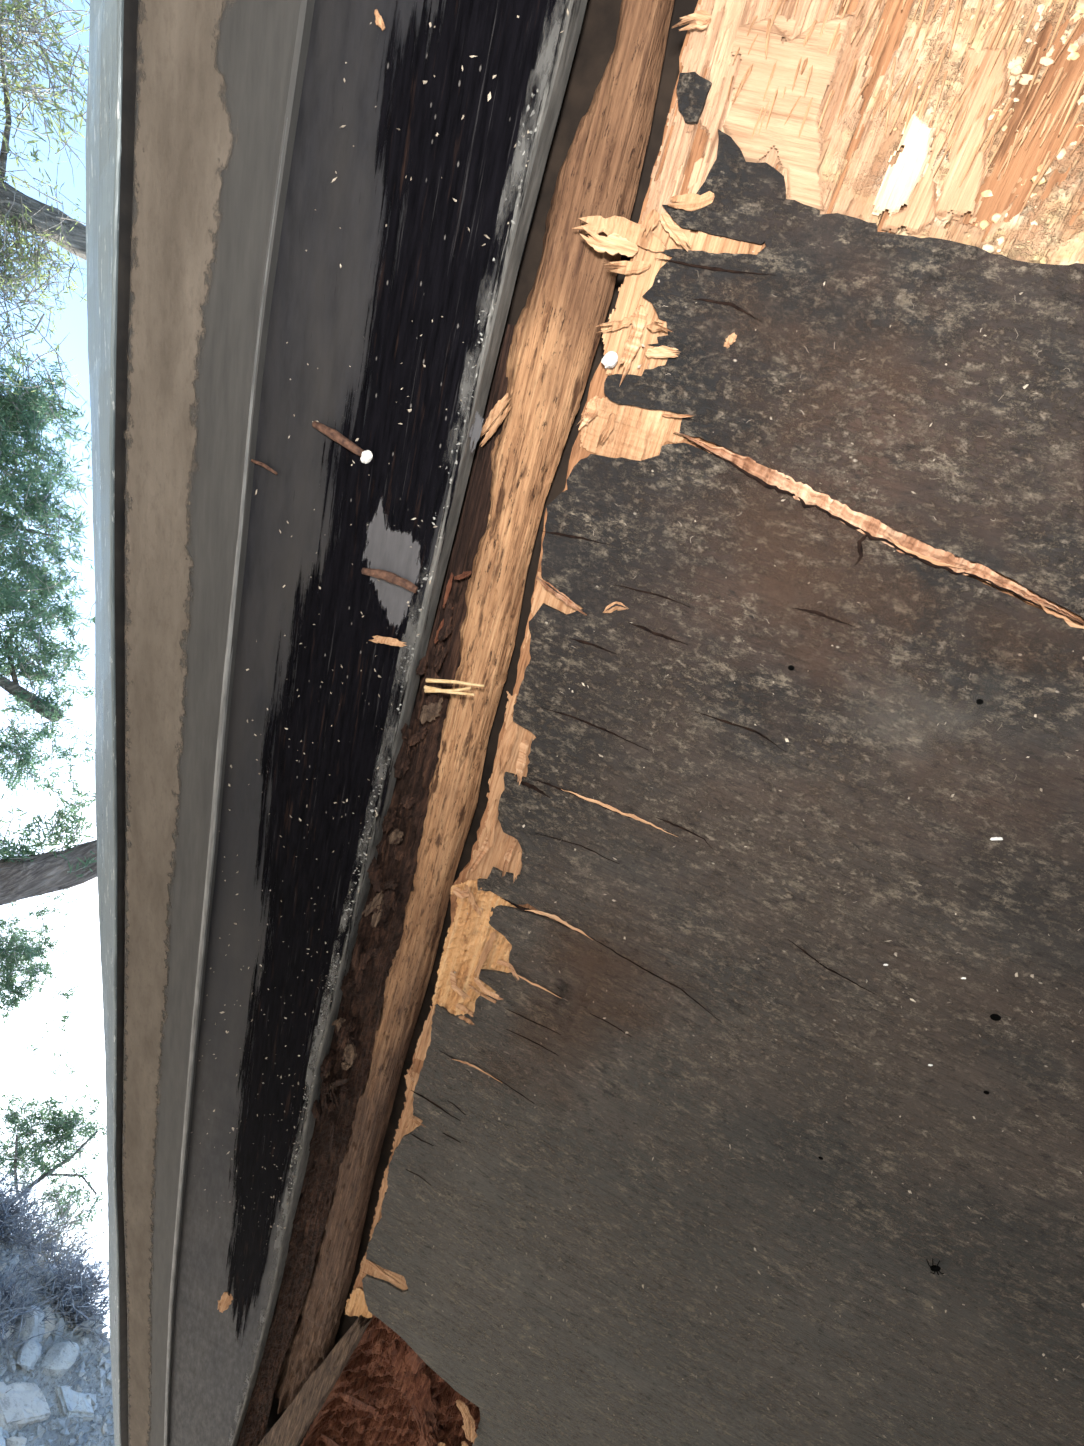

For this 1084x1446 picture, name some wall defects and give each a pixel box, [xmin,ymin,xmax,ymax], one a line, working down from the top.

peeling [497,0,564,231]
peeling [573,0,1084,385]
peeling [449,352,484,458]
peeling [577,396,694,461]
peeling [523,572,583,648]
crack [673,432,1084,629]
peeling [254,497,448,1354]
peeling [345,691,536,1318]
peeling [340,1392,383,1417]
peeling [385,1334,477,1446]